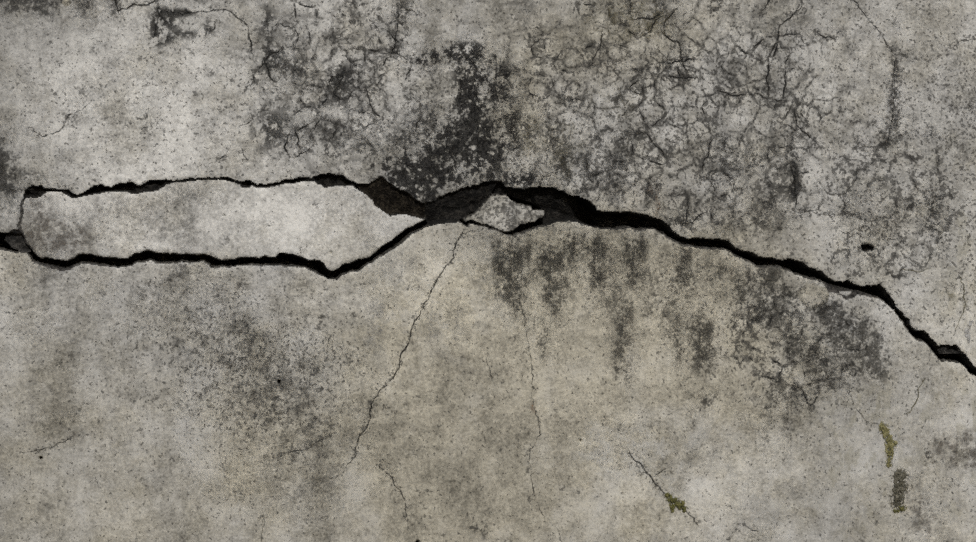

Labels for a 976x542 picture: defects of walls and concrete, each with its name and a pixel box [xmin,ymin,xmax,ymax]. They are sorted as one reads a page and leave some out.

water stain [262,11,303,77]
crack [0,0,430,280]
water stain [261,116,284,144]
water stain [322,67,354,100]
water stain [370,42,544,203]
crack [524,3,698,176]
crack [586,0,976,424]
crack [347,181,546,465]
water stain [492,236,606,312]
water stain [676,316,715,373]
water stain [737,268,801,327]
water stain [813,306,891,378]